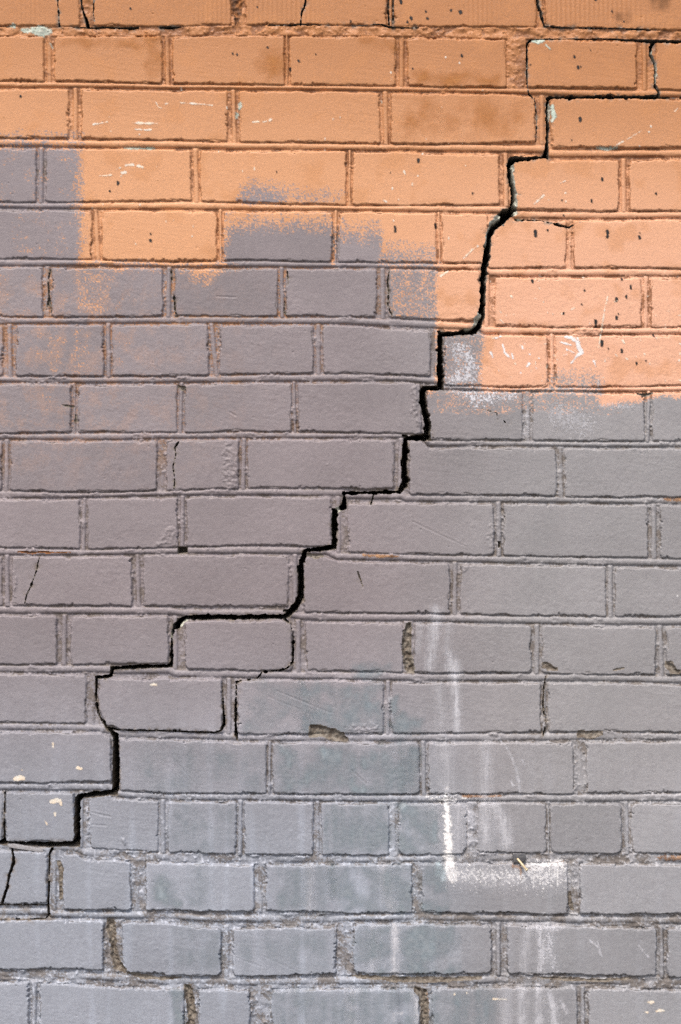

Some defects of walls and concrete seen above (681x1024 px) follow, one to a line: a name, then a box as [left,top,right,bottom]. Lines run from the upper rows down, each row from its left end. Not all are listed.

crack [45,269,53,313]
crack [169,271,177,316]
crack [171,38,681,630]
crack [24,556,41,604]
crack [247,632,295,681]
crack [234,680,242,741]
crack [540,676,548,736]
crack [0,628,226,921]